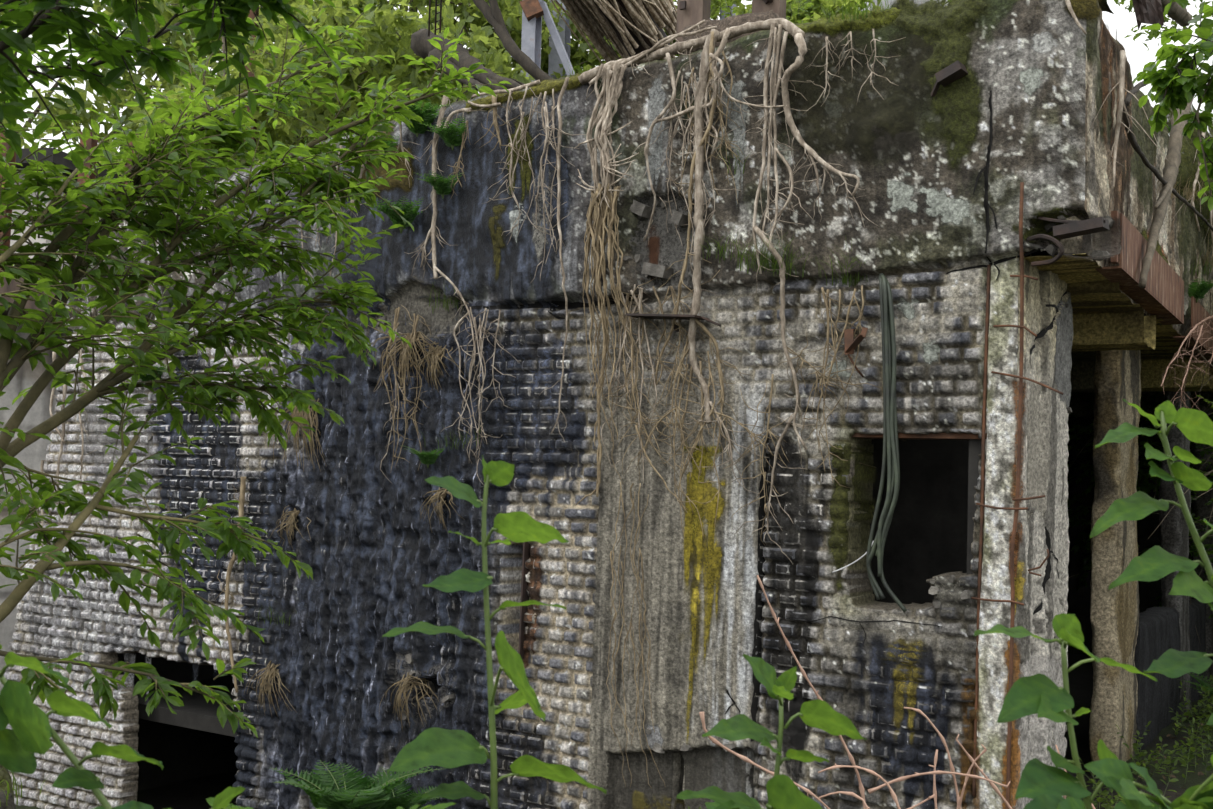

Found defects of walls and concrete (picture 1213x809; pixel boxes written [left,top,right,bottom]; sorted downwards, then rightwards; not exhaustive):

crack [946,90,1044,280]
corrosion [1012,381,1026,505]
damp [684,445,722,741]
corrosion [1009,520,1023,582]
corrosion [1004,640,1020,696]
corrosion [1001,720,1021,809]